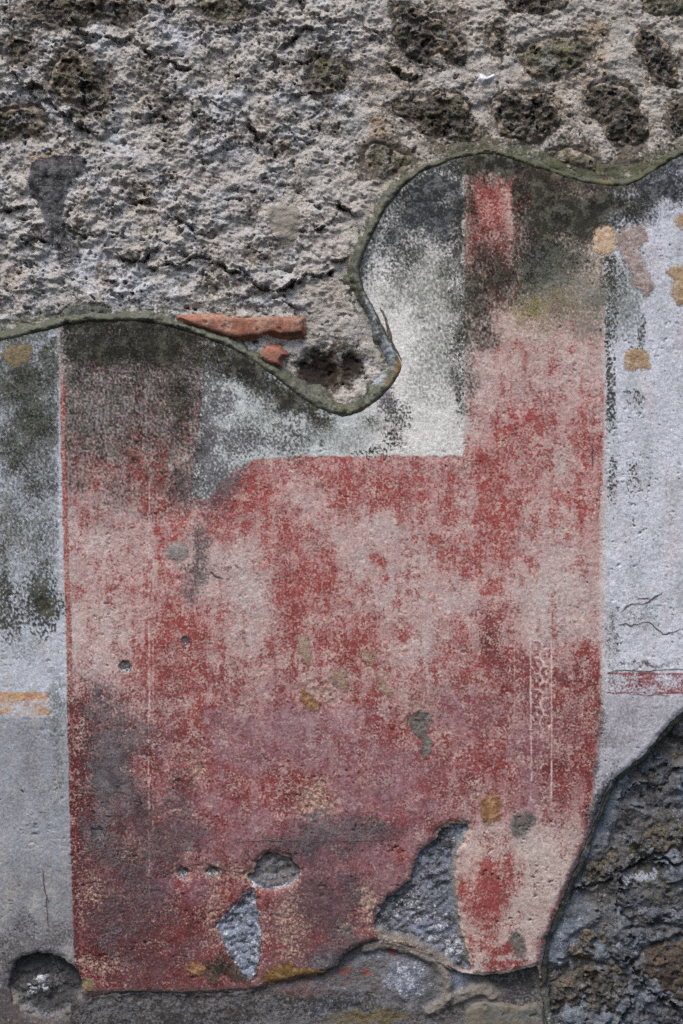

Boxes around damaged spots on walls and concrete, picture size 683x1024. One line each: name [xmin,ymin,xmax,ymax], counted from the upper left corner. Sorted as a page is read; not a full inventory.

peeling [0,0,683,417]
crack [618,593,681,635]
peeling [10,712,683,1024]